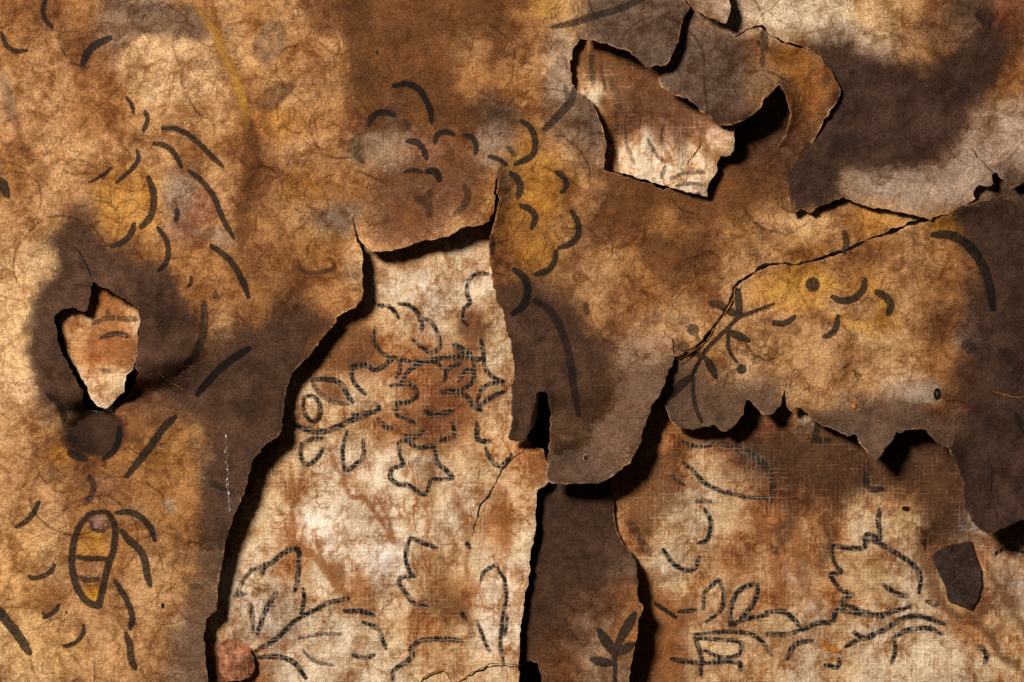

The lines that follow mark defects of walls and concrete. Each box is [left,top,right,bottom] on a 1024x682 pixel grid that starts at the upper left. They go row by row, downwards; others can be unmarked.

damp [787,18,1010,210]
damp [27,223,328,533]
crack [672,218,925,358]